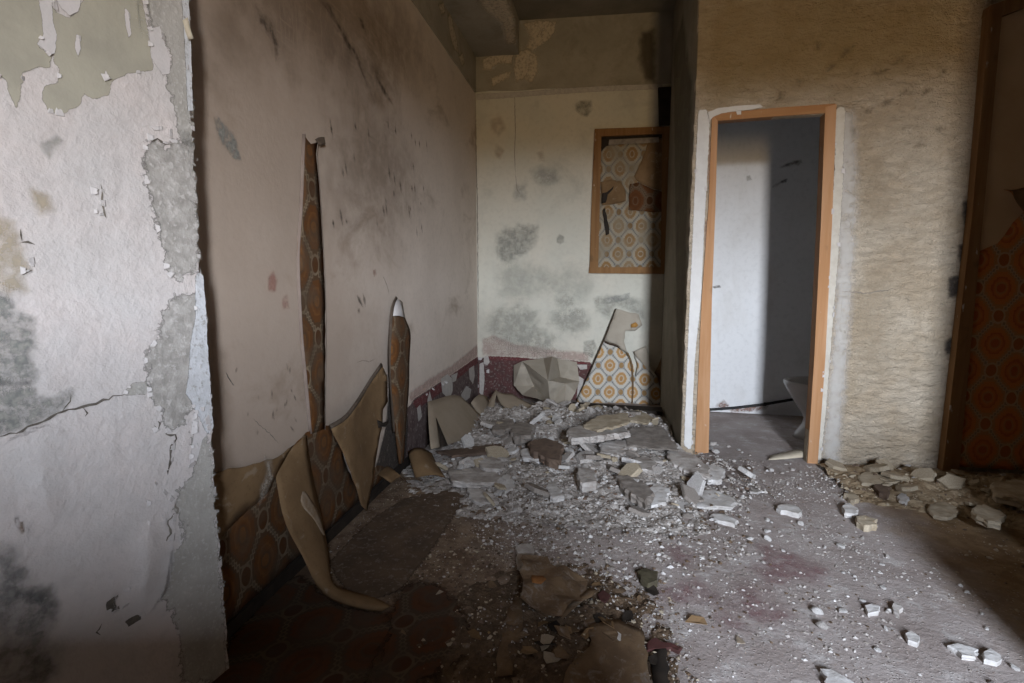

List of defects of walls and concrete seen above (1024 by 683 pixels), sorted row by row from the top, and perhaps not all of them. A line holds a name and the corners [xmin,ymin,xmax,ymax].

leakage [0,225,64,433]
crack [0,394,124,437]
peeling [0,0,229,683]
peeling [376,355,490,469]
peeling [577,364,587,398]